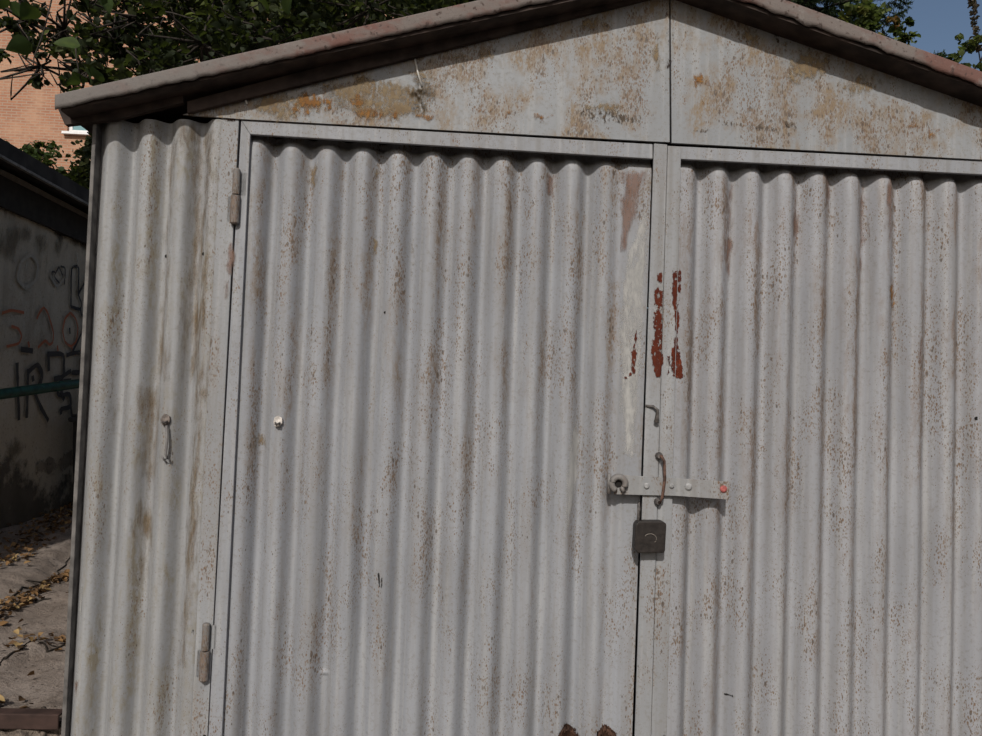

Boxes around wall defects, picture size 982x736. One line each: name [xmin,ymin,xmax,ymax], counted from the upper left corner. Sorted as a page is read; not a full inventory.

corrosion [254,69,437,121]